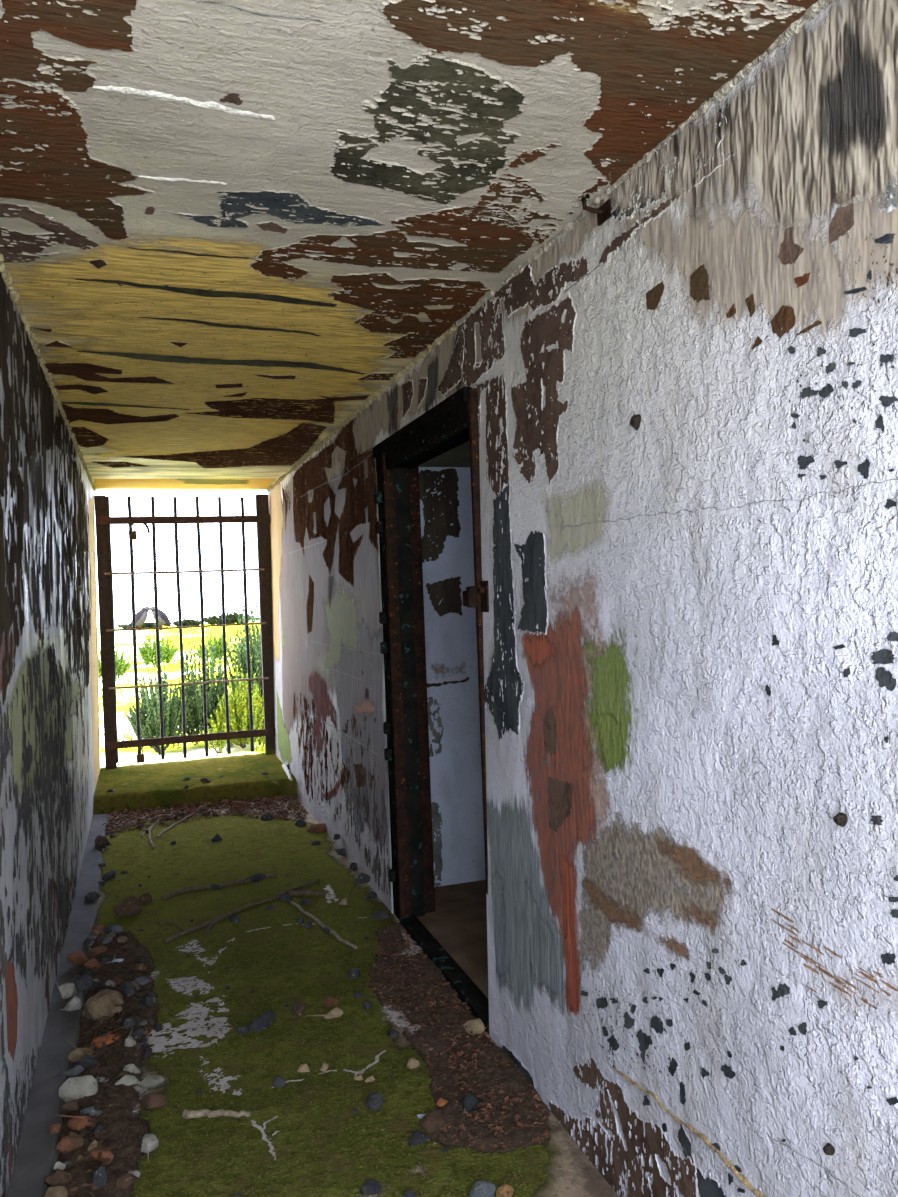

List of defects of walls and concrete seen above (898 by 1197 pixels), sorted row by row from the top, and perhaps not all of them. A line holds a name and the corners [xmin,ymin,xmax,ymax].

leakage [530,0,898,329]
peeling [829,183,859,244]
peeling [145,0,822,741]
peeling [799,347,862,399]
peeling [875,395,898,431]
peeling [833,459,870,479]
peeling [0,0,391,1197]
peeling [870,632,898,692]
peeling [684,948,732,1007]
peeling [881,953,895,965]
peeling [581,991,673,1063]
peeling [668,1042,690,1104]